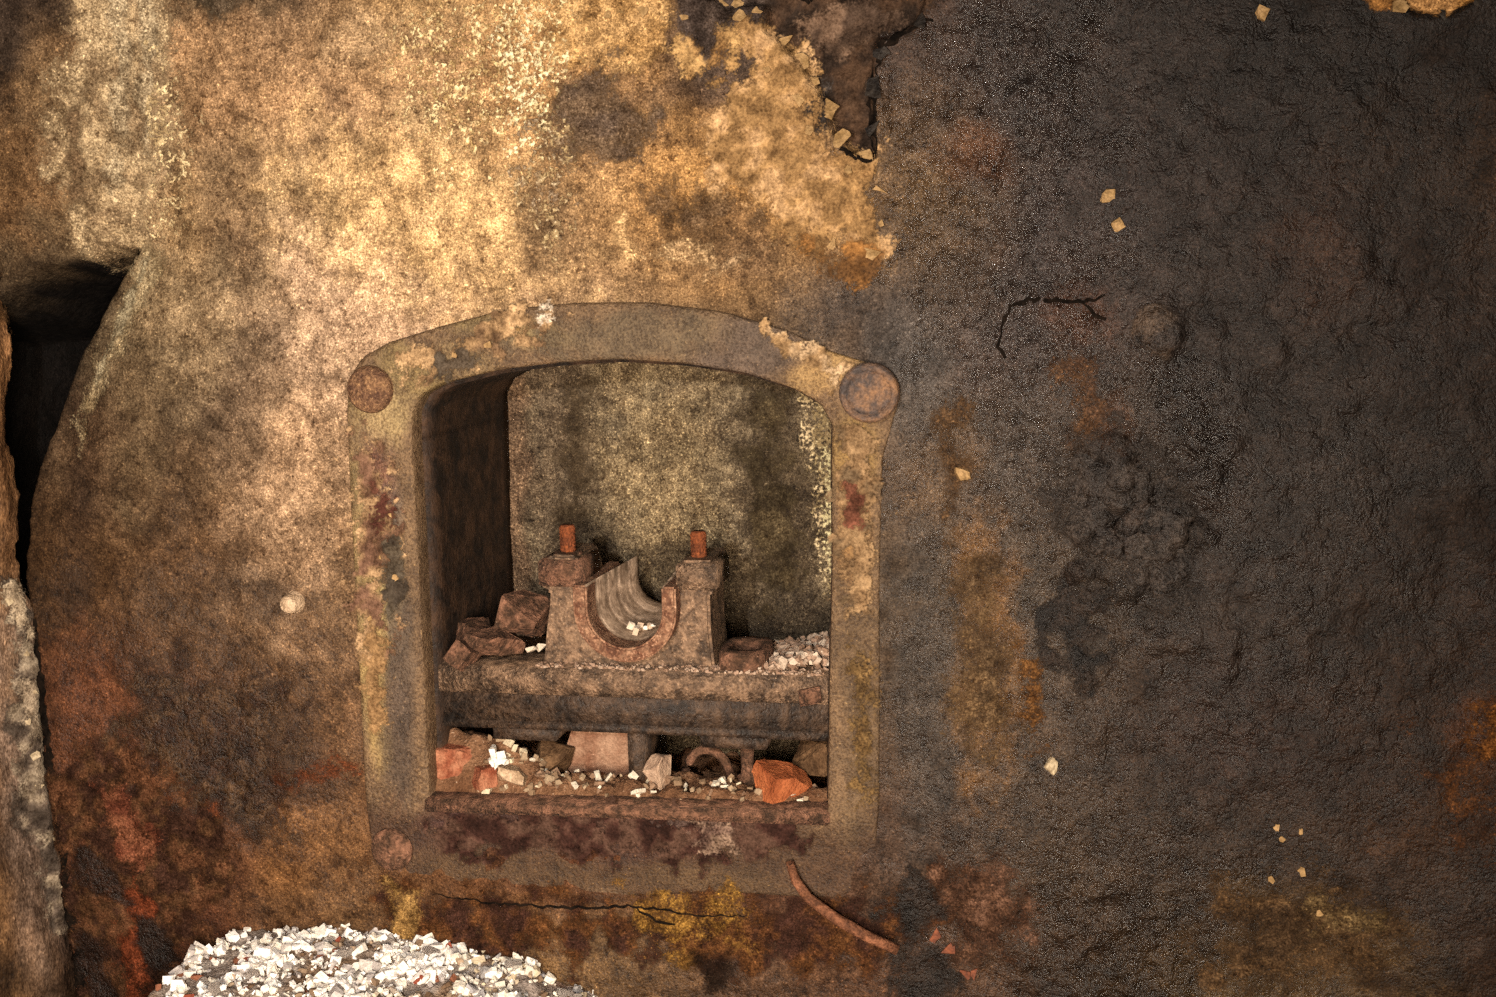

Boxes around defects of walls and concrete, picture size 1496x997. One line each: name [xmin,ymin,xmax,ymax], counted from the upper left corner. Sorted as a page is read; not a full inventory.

peeling [548,0,935,292]
corrosion [681,746,735,780]
corrosion [44,719,237,997]
water stain [869,866,964,997]
water stain [1181,855,1421,997]